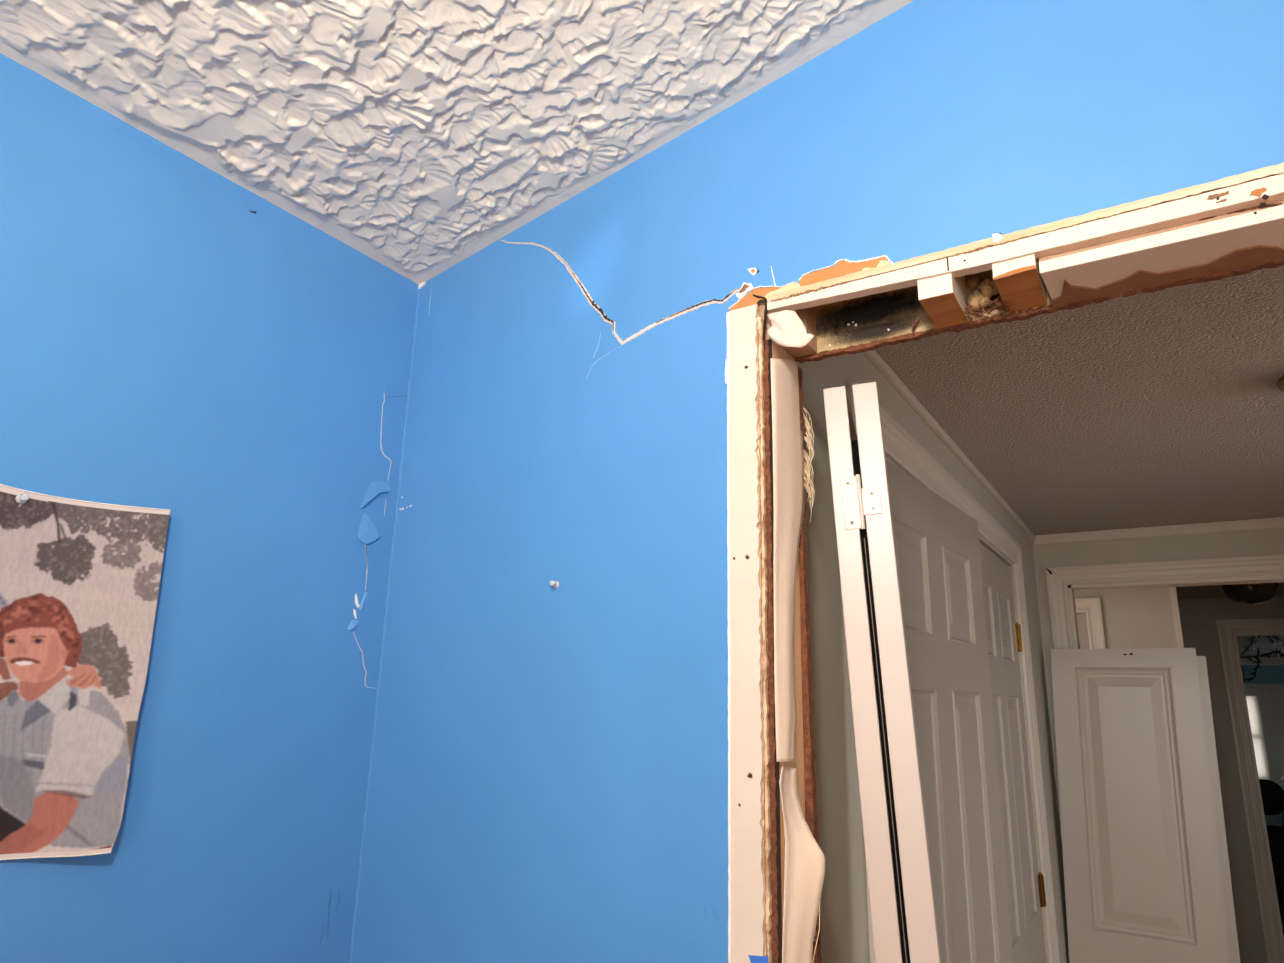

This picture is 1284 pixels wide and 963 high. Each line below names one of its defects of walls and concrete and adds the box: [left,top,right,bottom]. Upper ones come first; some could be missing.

crack [500,240,738,379]
crack [348,386,401,689]
peeling [725,255,895,963]